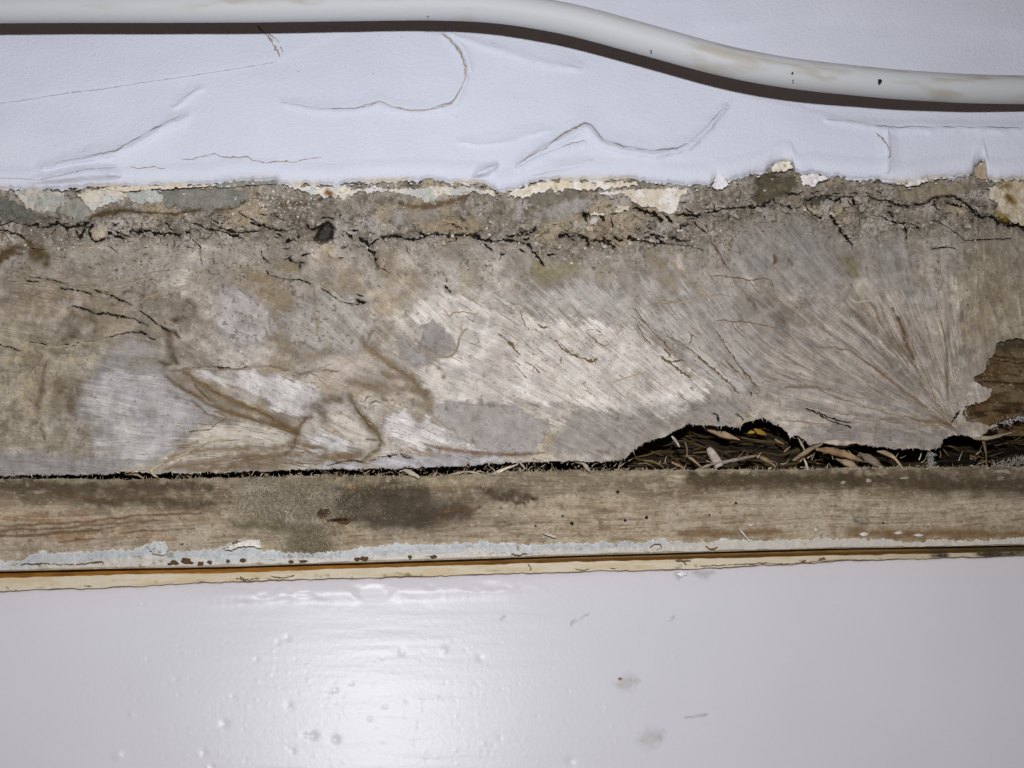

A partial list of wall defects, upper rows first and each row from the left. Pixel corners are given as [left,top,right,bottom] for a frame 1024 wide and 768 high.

flaking render [0,161,1024,263]
crack [0,186,1024,305]
leakage [0,331,485,560]
leakage [578,471,686,480]